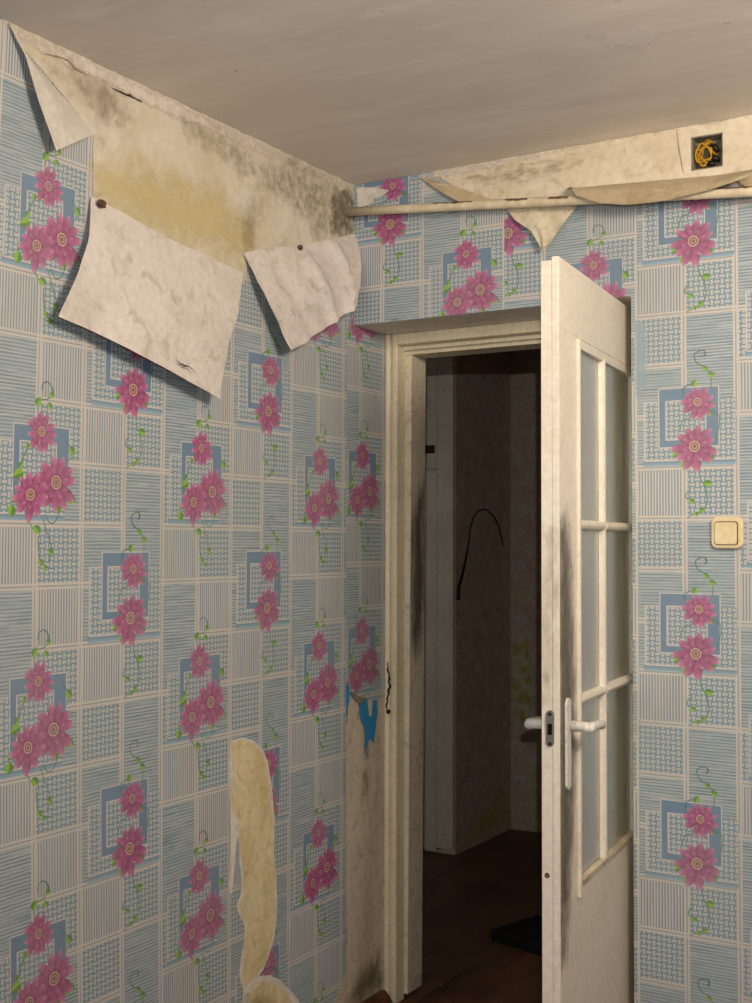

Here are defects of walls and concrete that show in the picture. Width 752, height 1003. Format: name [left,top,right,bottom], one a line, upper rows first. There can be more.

flaking render [3,19,354,283]
flaking render [425,115,752,200]
mould [278,175,355,235]
peeling [229,809,239,894]
flaking render [333,697,384,1003]